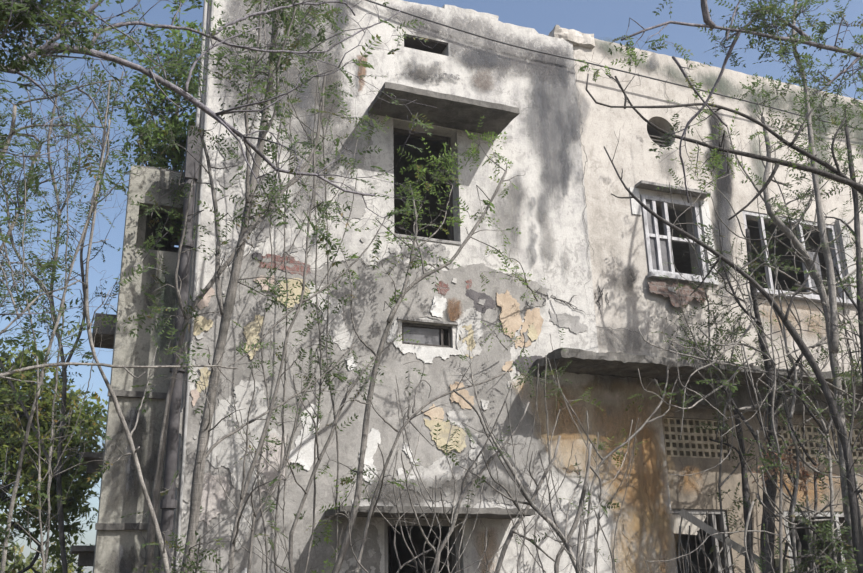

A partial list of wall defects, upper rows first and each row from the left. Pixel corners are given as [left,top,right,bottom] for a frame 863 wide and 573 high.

damp [390,6,589,264]
crack [534,53,653,337]
damp [708,108,735,287]
peeling [170,174,588,573]
damp [374,477,526,503]